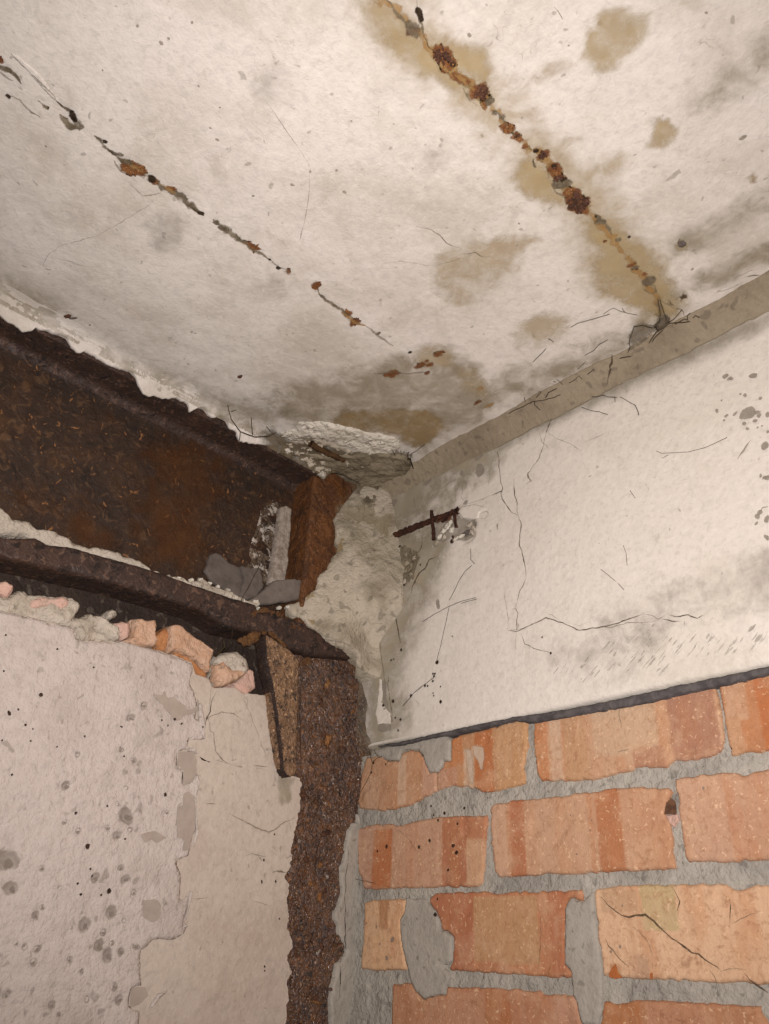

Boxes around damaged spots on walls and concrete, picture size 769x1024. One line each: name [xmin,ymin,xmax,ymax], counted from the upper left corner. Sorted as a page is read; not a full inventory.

water stain [370,3,489,88]
water stain [587,12,638,68]
water stain [653,121,675,146]
water stain [588,219,677,314]
corrosion [408,350,445,375]
water stain [336,410,443,446]
crack [481,420,703,652]
peeling [0,582,255,1024]
crack [601,889,767,996]